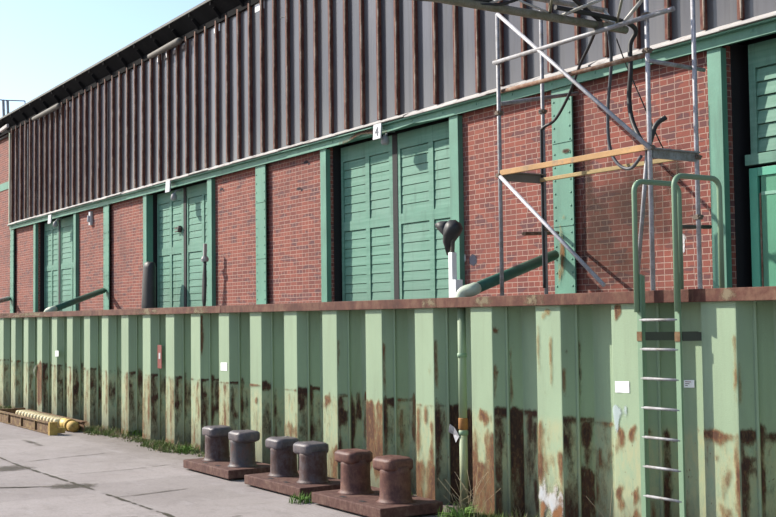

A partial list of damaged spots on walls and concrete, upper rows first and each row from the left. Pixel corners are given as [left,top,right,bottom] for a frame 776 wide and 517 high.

corrosion [2,357,271,451]
corrosion [256,385,547,517]
peeling [539,480,563,517]
corrosion [557,416,610,517]
corrosion [604,422,636,447]
corrosion [615,487,640,517]
corrosion [664,430,672,517]
corrosion [704,424,776,517]